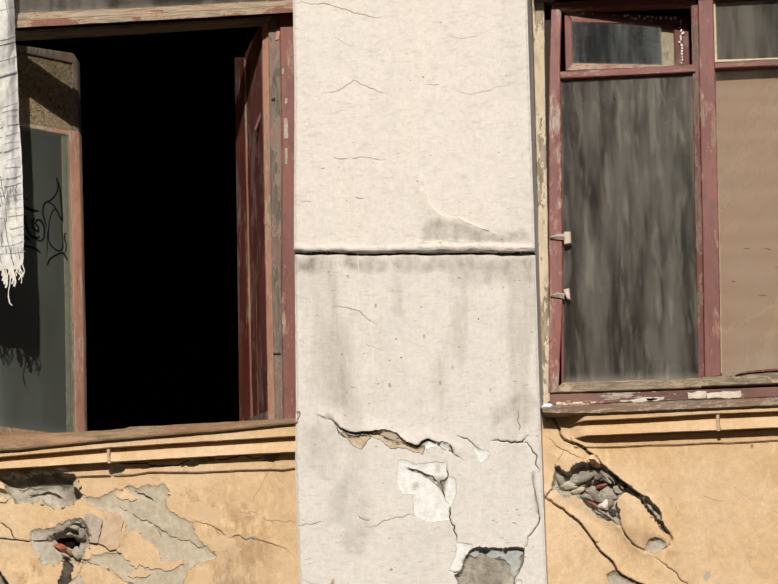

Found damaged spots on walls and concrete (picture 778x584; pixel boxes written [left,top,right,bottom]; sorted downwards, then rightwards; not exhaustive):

crack [295,249,535,257]
flaking render [0,464,242,584]
crack [120,507,215,555]
crack [111,455,322,526]
crack [202,523,285,549]
peeling [342,430,456,522]
crack [334,414,641,584]
flaking render [450,543,526,584]
flaking render [551,455,670,557]
crack [621,527,688,584]